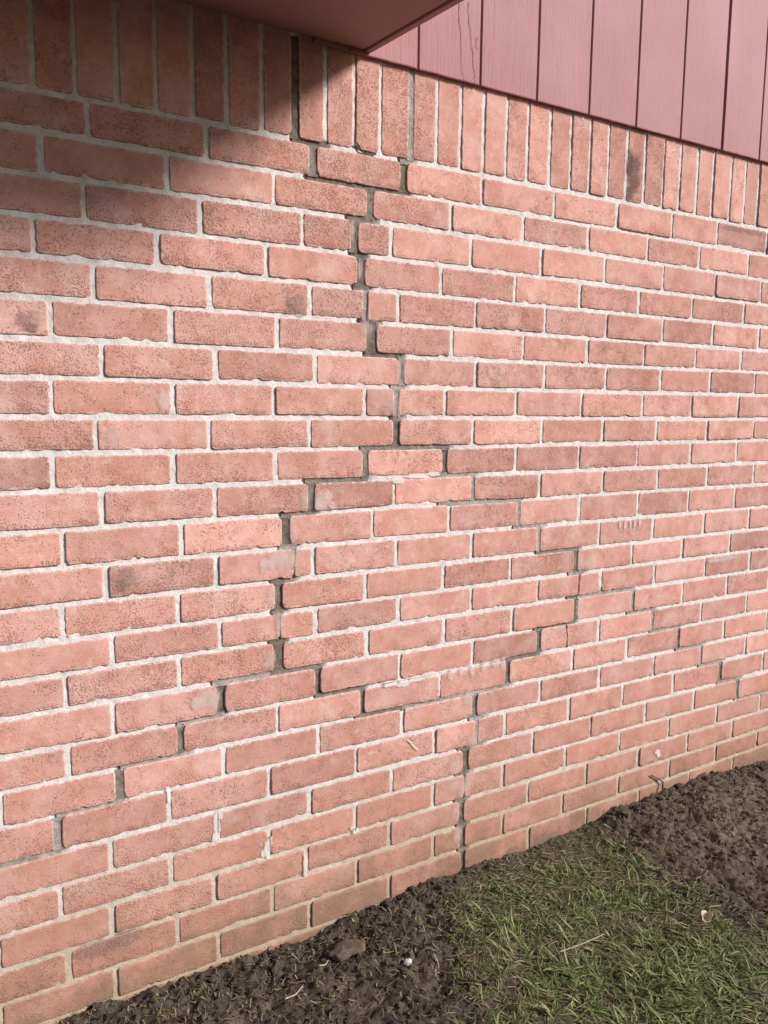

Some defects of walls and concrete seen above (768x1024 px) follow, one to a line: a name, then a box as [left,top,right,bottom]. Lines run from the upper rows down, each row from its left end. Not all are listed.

crack [279,35,584,596]
leakage [628,153,640,199]
crack [0,574,767,869]